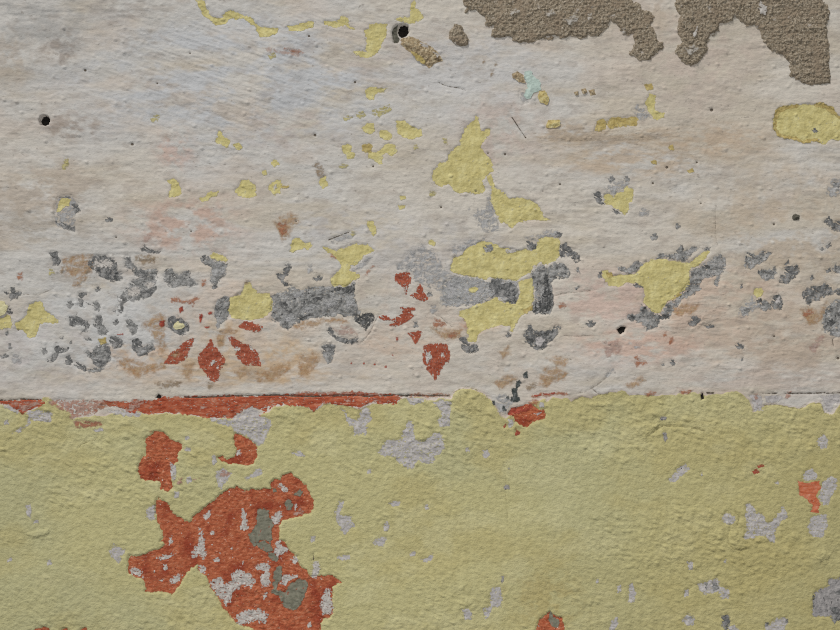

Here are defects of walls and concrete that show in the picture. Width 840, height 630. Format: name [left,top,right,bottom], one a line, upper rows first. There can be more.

flaking render [463,0,664,61]
flaking render [674,0,831,85]
peeling [773,102,840,145]
peeling [396,116,581,353]
peeling [42,255,198,372]
peeling [200,231,391,331]
peeling [598,244,726,334]
peeling [738,250,800,318]
peeling [802,275,840,339]
peeling [508,400,546,436]
peeling [107,407,342,630]
peeling [798,468,838,538]